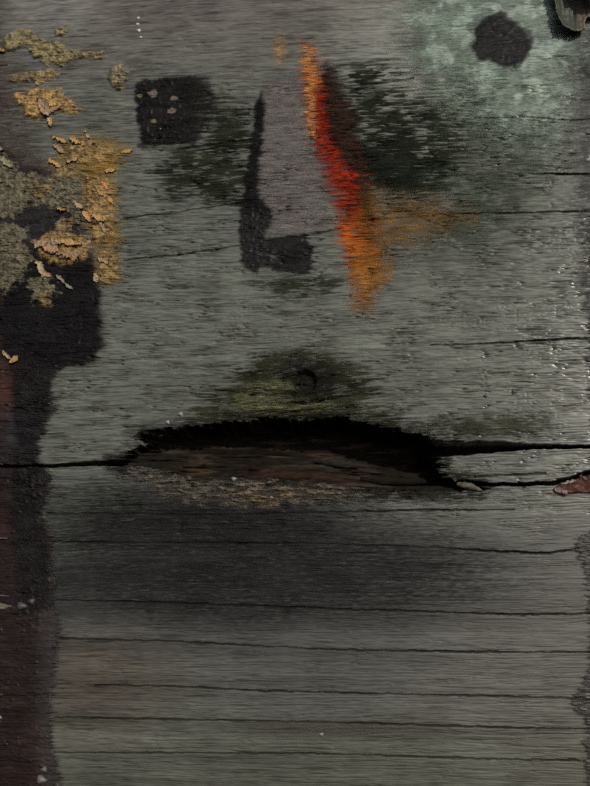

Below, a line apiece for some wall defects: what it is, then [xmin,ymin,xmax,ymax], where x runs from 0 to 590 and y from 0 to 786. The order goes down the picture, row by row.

leakage [239,94,272,272]
rust [299,44,445,300]
peeling [579,18,590,367]
peeling [0,46,104,786]
crack [39,460,123,468]
crack [268,507,515,515]
crack [428,444,590,459]
crack [466,471,590,488]
peeling [554,474,587,494]
peeling [569,533,590,624]
peeling [571,636,590,786]